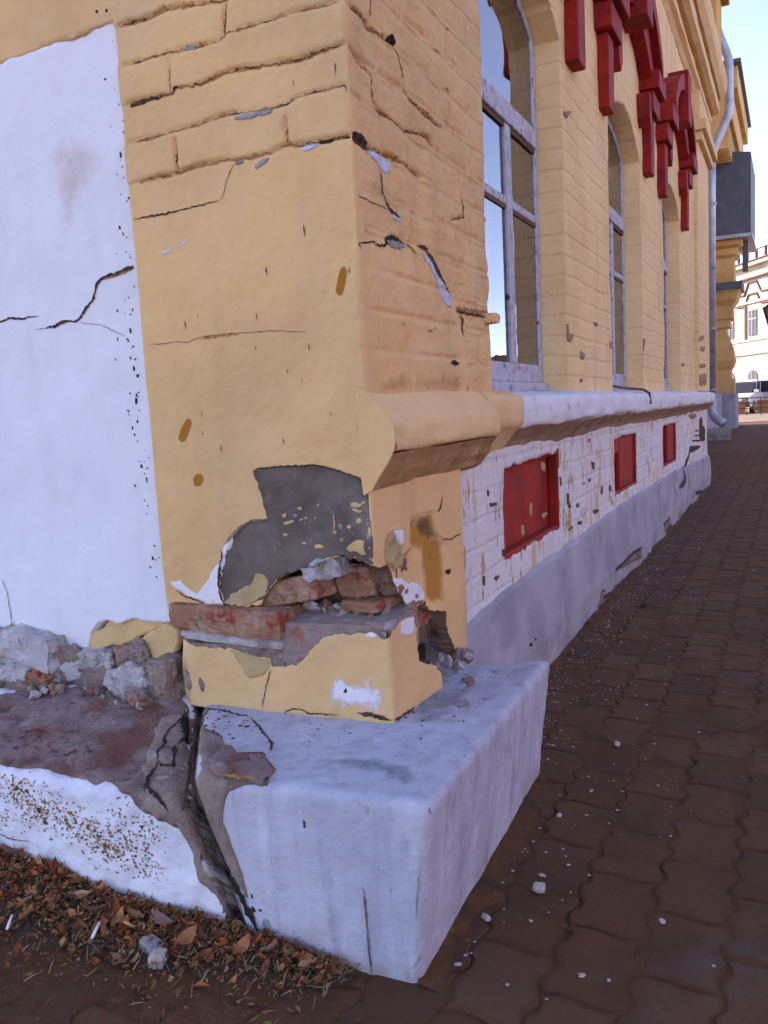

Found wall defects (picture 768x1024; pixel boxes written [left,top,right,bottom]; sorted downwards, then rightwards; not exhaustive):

crack [0,265,134,335]
crack [135,163,236,219]
crack [157,330,305,345]
crack [358,150,500,337]
peeling [0,464,492,724]
crack [144,650,415,933]